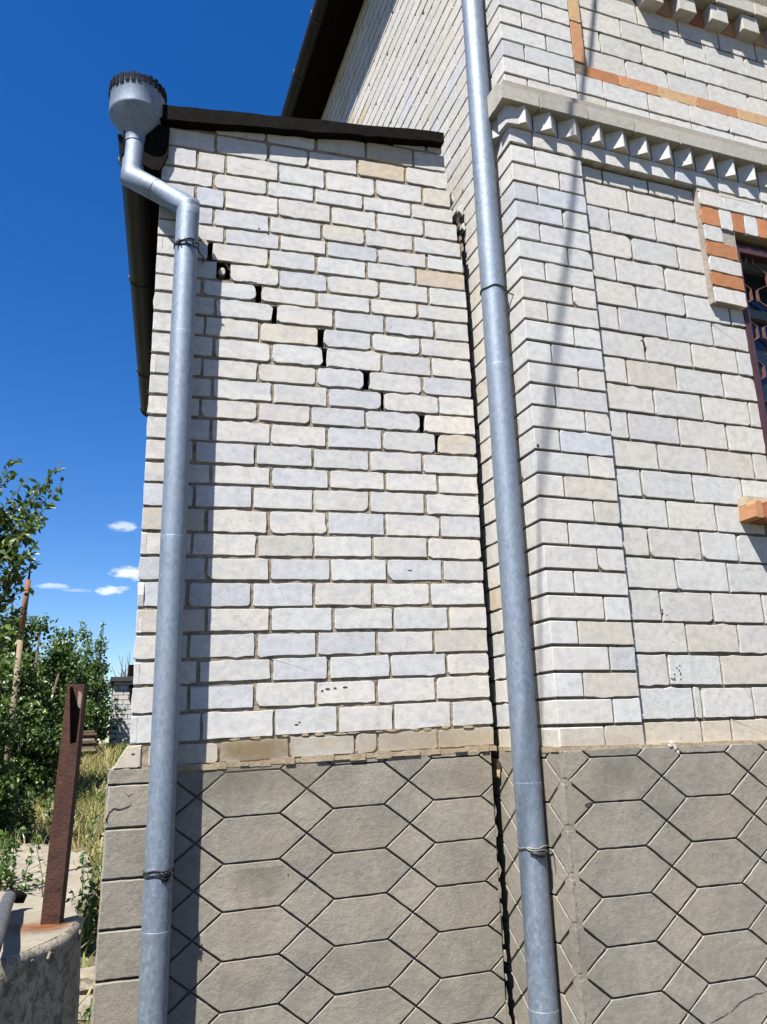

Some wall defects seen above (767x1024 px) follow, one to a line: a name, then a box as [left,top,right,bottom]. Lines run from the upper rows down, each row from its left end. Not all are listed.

crack [201,239,440,455]
crack [448,195,466,292]
crack [490,753,512,1024]